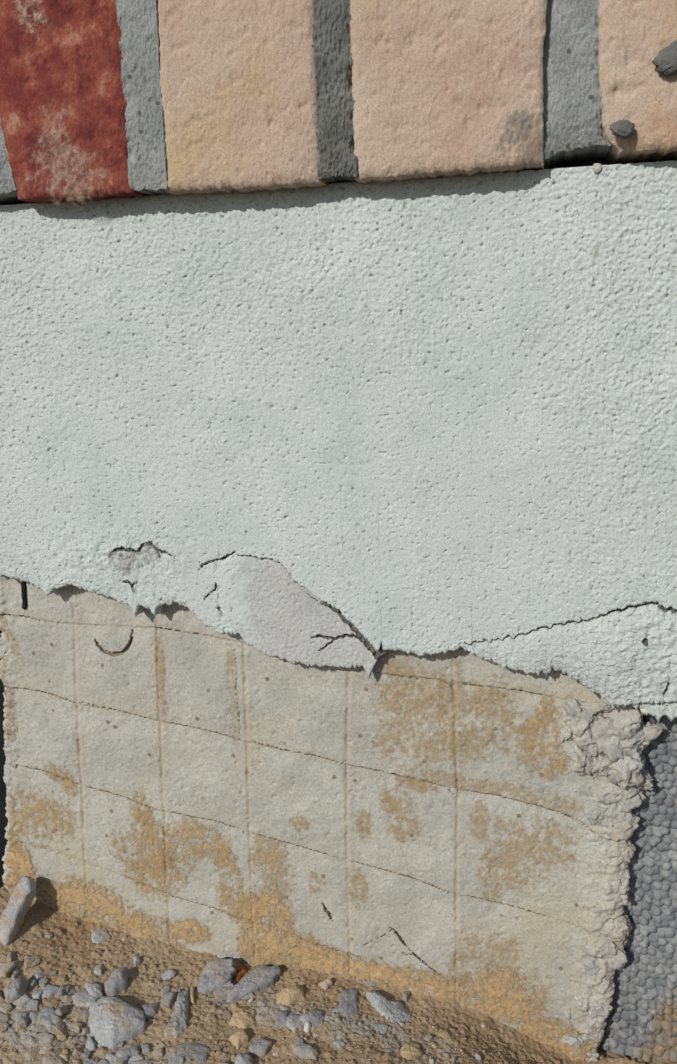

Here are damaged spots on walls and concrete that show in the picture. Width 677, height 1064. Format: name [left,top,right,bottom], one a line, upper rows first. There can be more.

crack [110,542,172,558]
crack [198,552,235,613]
spalling [94,629,134,657]
flaking render [213,553,383,679]
crack [301,586,543,695]
crack [484,601,677,640]
spalling [555,697,664,1063]
spalling [223,965,247,987]